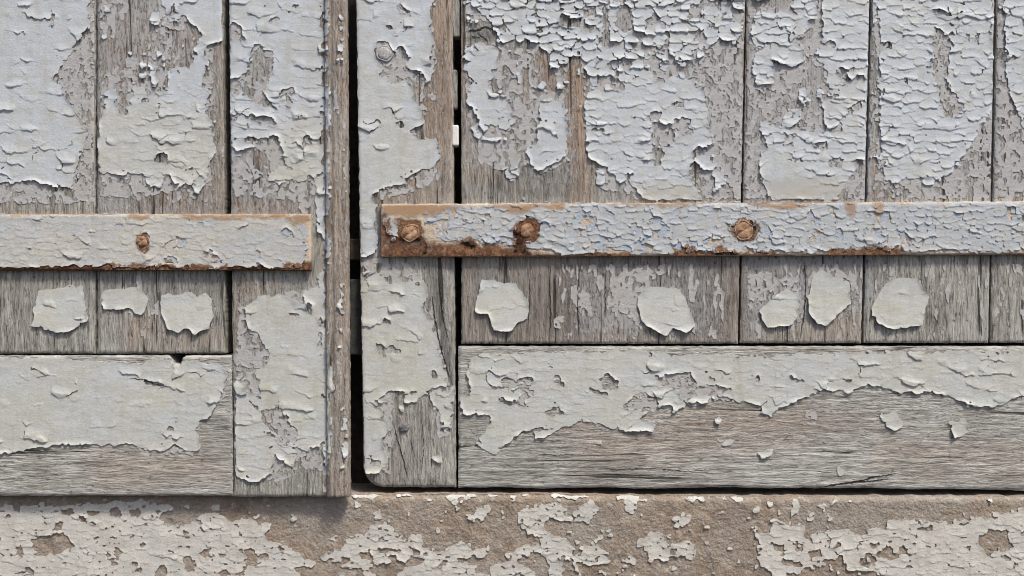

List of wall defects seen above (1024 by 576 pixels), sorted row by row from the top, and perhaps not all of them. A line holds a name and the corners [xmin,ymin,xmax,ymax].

rust [105,232,228,270]
peeling [0,0,348,492]
rust [184,214,308,224]
rust [283,262,310,270]
rust [381,204,564,257]
peeling [343,0,1024,474]
rust [674,217,776,255]
rust [827,244,904,255]
peeling [0,493,709,576]
peeling [747,499,1024,576]